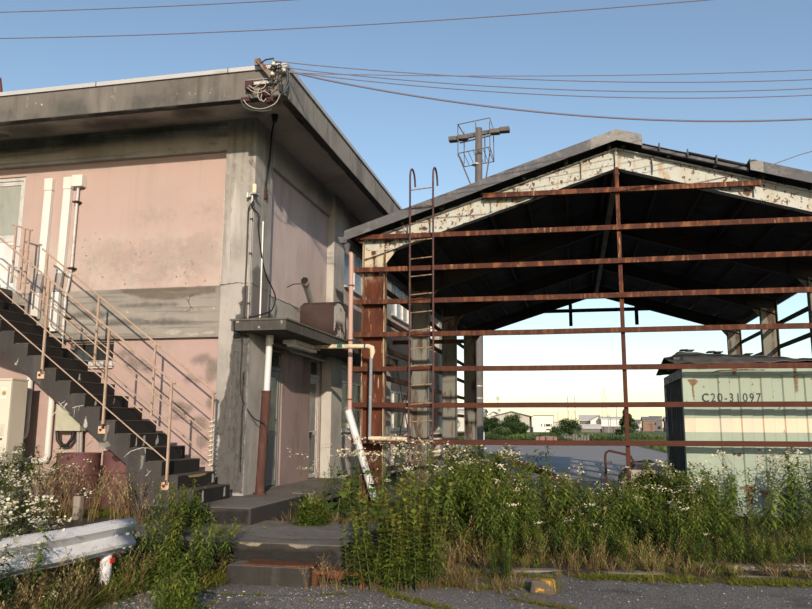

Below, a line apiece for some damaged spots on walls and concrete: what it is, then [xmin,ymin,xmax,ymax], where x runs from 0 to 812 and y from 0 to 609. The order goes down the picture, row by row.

damp [236,286,248,322]
damp [210,333,250,496]
damp [201,491,248,524]
rust [743,486,769,504]